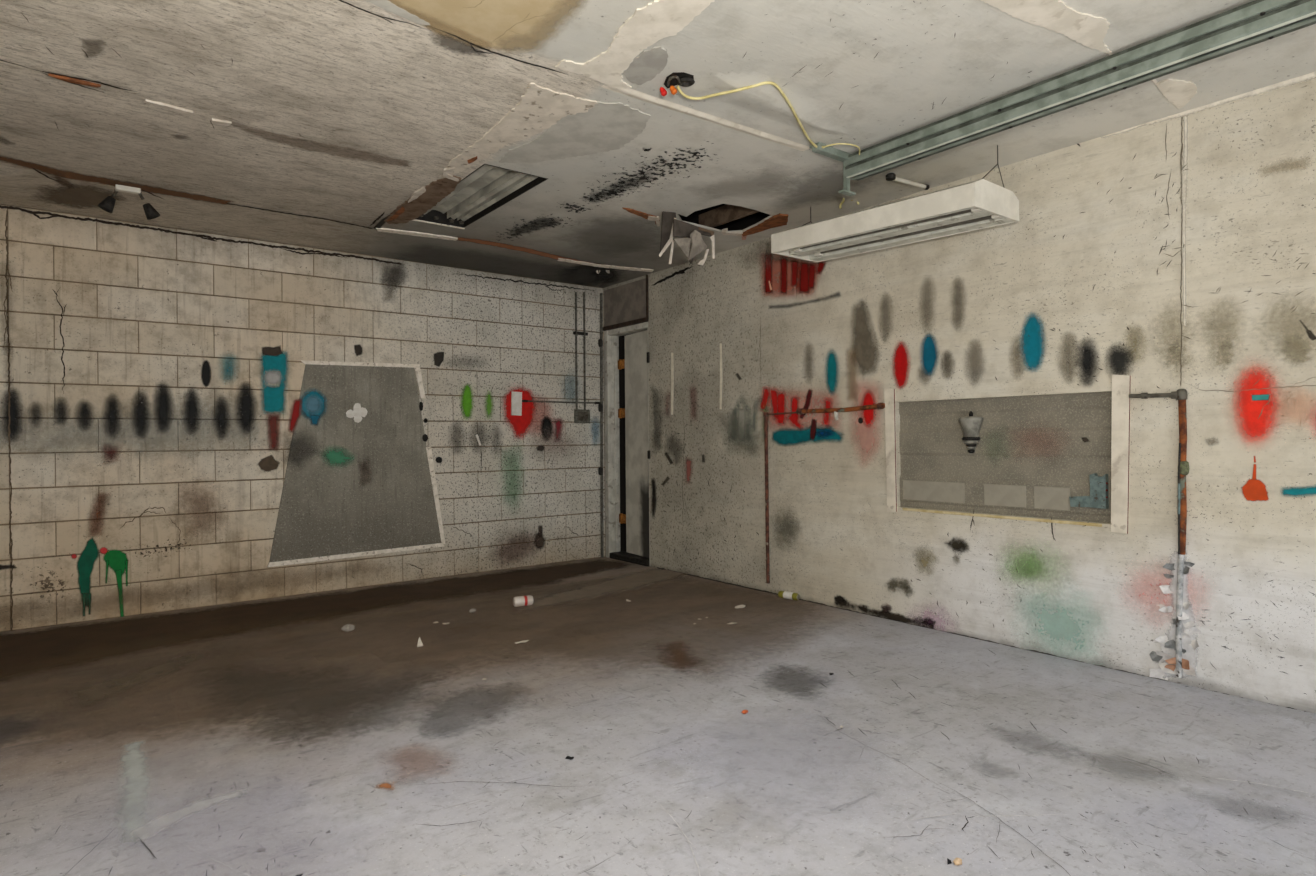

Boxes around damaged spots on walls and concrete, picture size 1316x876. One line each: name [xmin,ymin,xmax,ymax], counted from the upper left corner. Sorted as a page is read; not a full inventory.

peeling [364,0,430,25]
peeling [981,0,1111,53]
peeling [441,0,715,182]
peeling [376,187,458,241]
leakage [496,141,715,241]
peeling [1101,71,1316,326]